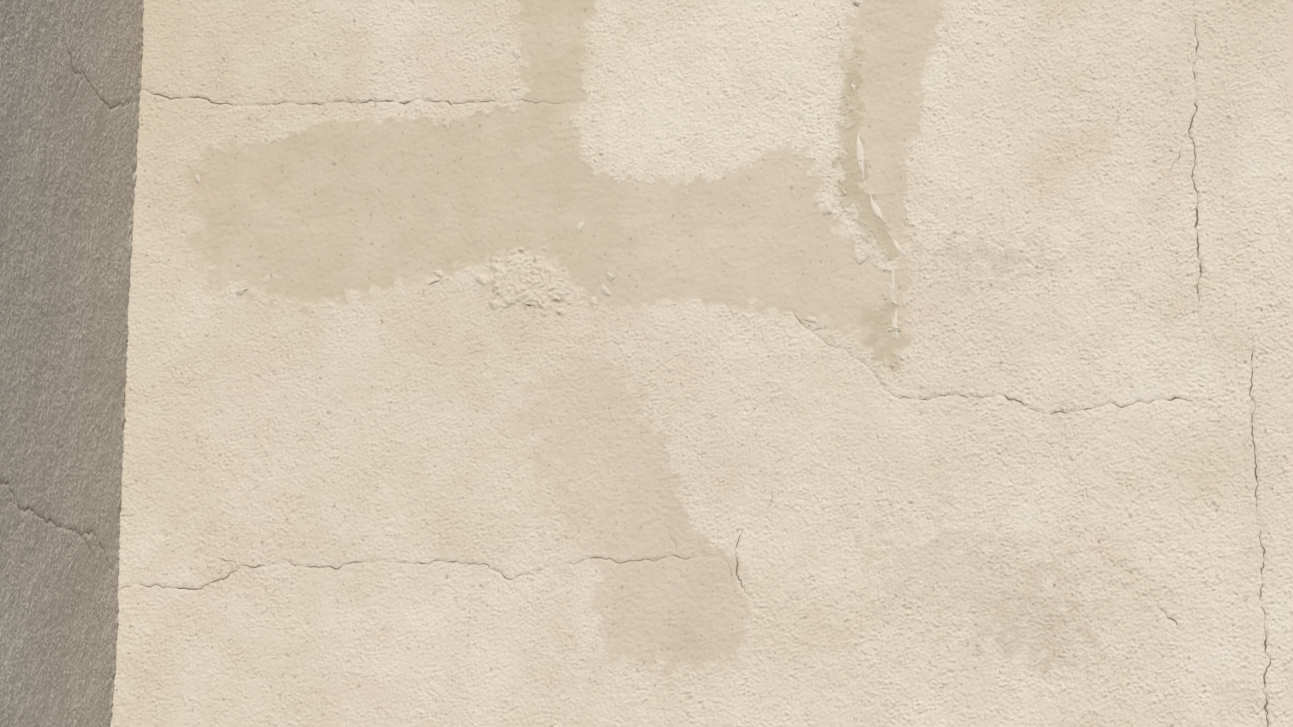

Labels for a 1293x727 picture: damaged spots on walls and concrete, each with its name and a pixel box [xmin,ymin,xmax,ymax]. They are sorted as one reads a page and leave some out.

flaking render [160,0,951,356]
damp [842,298,914,371]
crack [1170,2,1202,315]
crack [0,482,108,560]
crack [120,559,363,590]
crack [1249,351,1271,727]